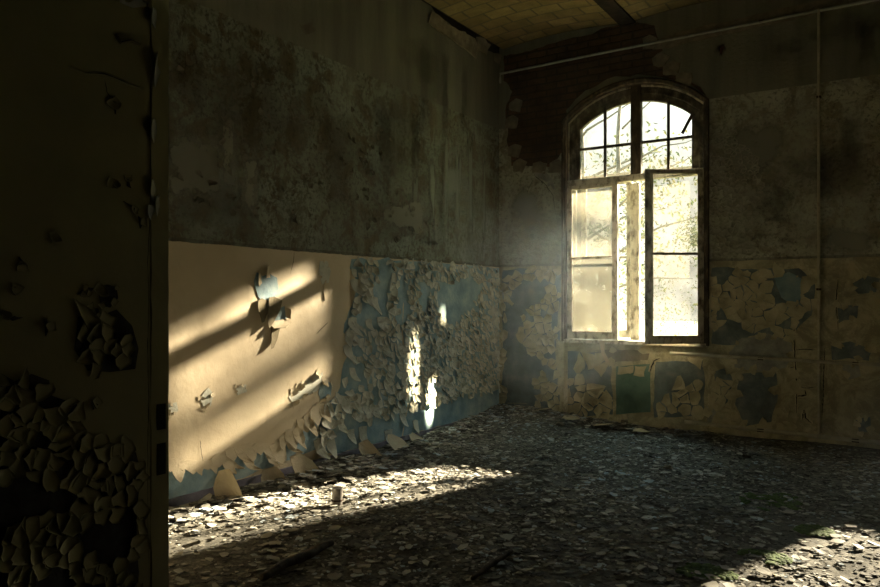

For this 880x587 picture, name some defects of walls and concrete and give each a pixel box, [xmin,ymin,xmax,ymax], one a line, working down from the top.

flaking render [503,22,705,174]
leakage [169,124,257,213]
leakage [382,137,485,237]
peeling [74,282,139,380]
peeling [168,256,781,499]
peeling [709,261,817,345]
peeling [0,367,151,587]